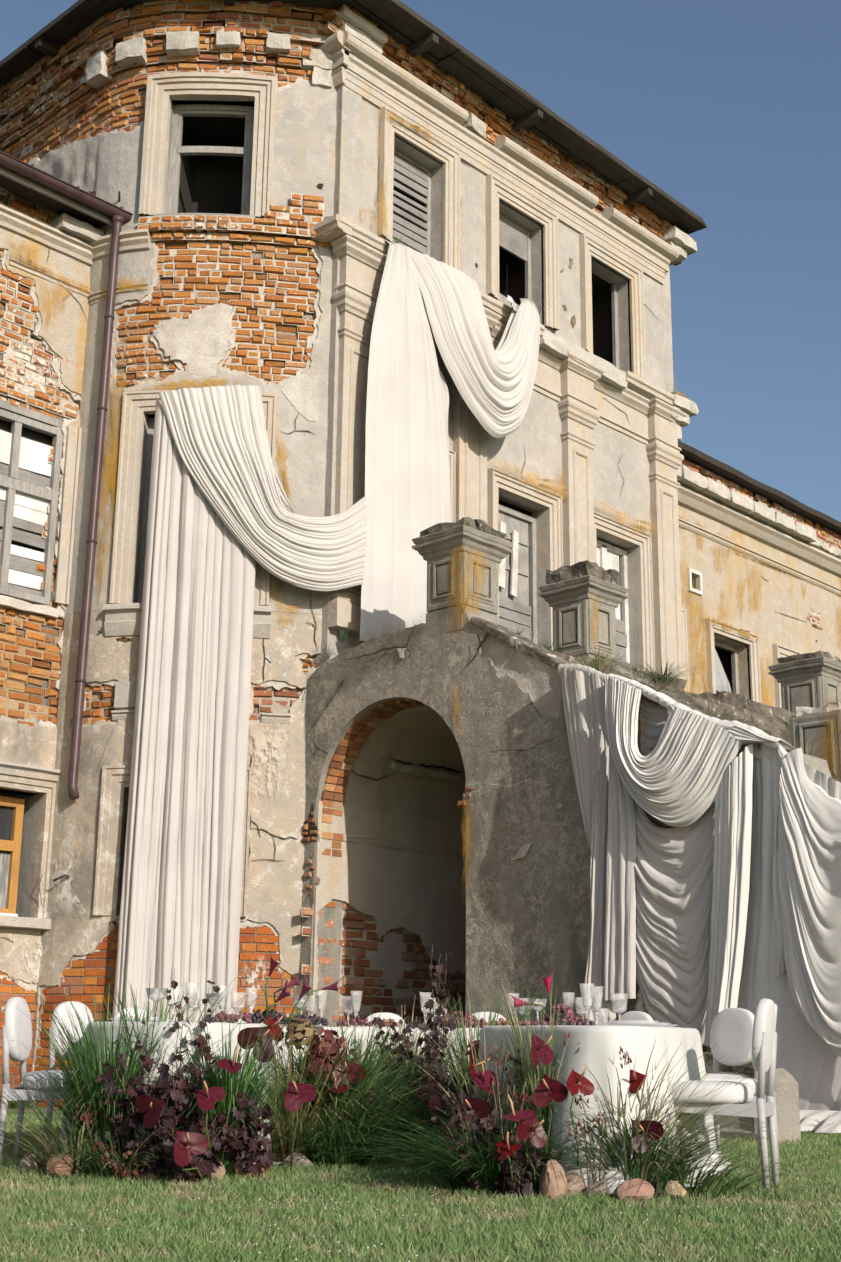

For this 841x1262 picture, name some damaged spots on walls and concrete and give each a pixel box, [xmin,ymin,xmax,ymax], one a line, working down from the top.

spalling [0,0,672,238]
spalling [0,251,80,539]
spalling [113,183,333,422]
spalling [681,459,841,549]
spalling [0,559,64,726]
crack [466,634,481,667]
water stain [762,675,771,706]
spalling [300,698,466,1028]